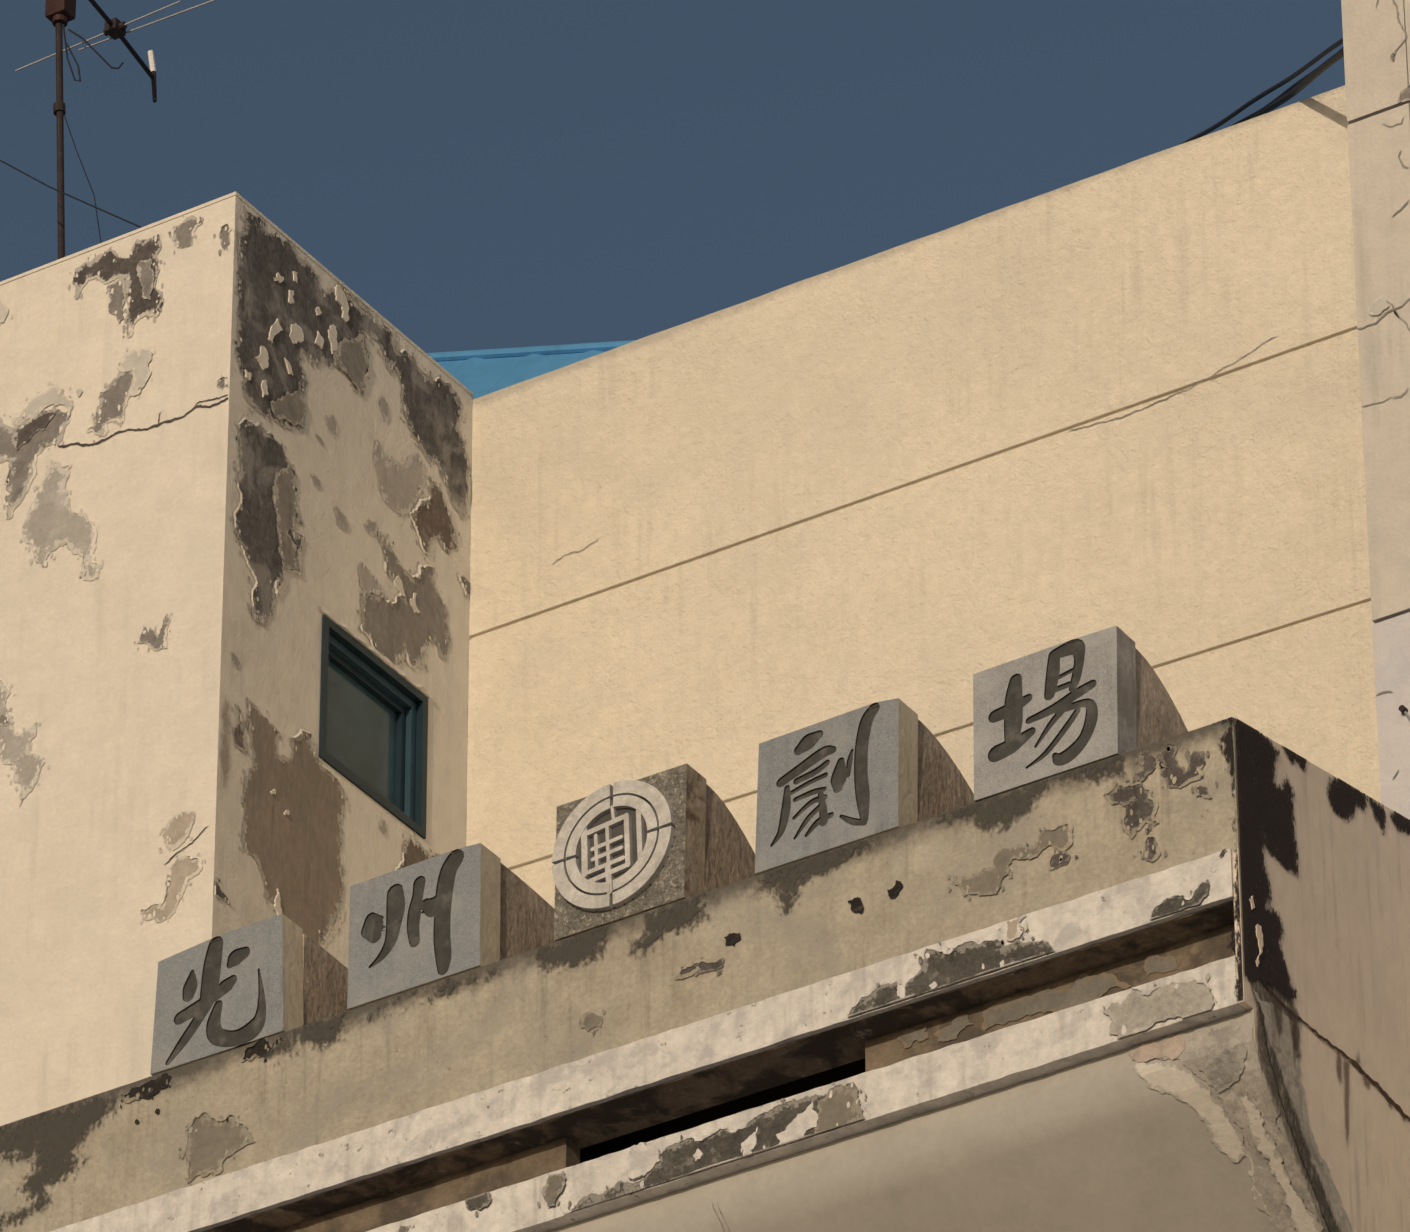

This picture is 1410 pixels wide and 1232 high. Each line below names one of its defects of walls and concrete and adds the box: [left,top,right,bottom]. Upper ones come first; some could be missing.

crack [1376,0,1407,60]
crack [1358,295,1410,332]
peeling [0,381,104,581]
crack [58,394,228,448]
peeling [67,206,471,670]
crack [1362,388,1408,407]
peeling [0,676,50,807]
peeling [232,697,348,946]
peeling [1103,743,1218,862]
spalling [847,914,1056,1017]
peeling [537,1082,866,1214]
spalling [897,955,1351,1232]